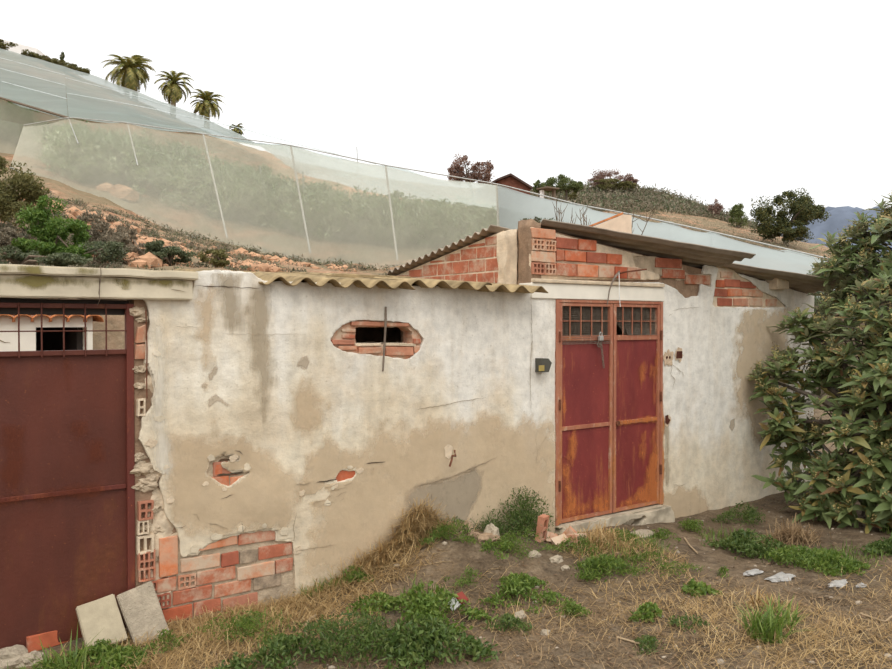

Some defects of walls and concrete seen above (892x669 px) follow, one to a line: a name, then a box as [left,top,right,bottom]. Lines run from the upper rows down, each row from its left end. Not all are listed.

leakage [218,274,241,327]
spalling [529,227,785,308]
spalling [129,306,165,422]
leakage [252,290,269,404]
spalling [324,466,364,505]
leakage [155,328,555,569]
corrosion [620,415,664,435]
corrosion [627,446,664,505]
spalling [130,439,302,623]